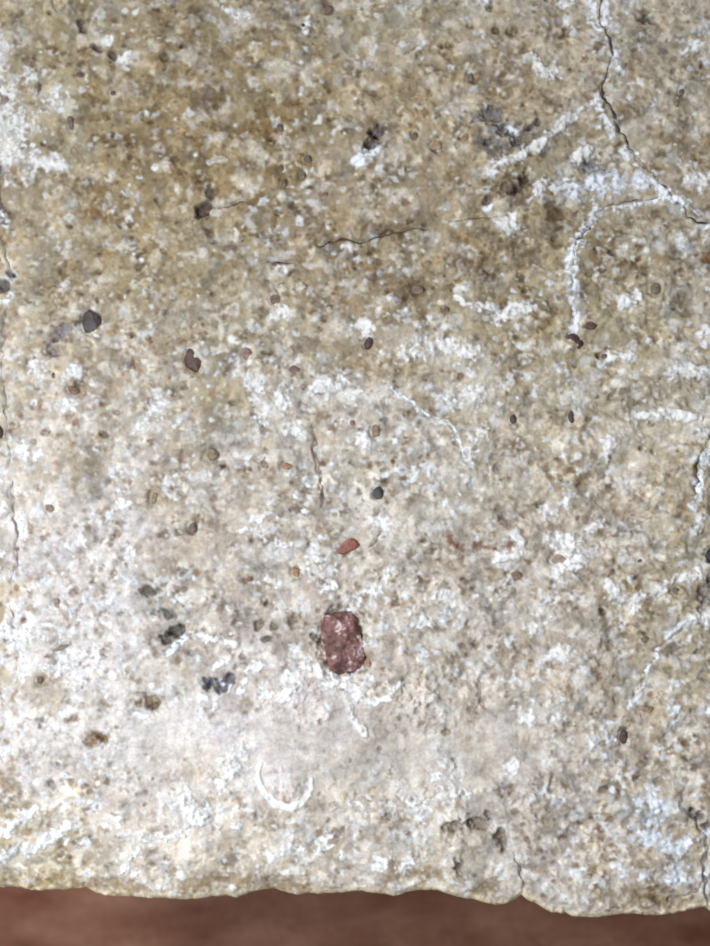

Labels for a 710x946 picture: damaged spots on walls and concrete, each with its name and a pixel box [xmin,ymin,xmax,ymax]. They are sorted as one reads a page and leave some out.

crack [559,0,710,341]
crack [311,228,429,248]
crack [687,435,710,512]